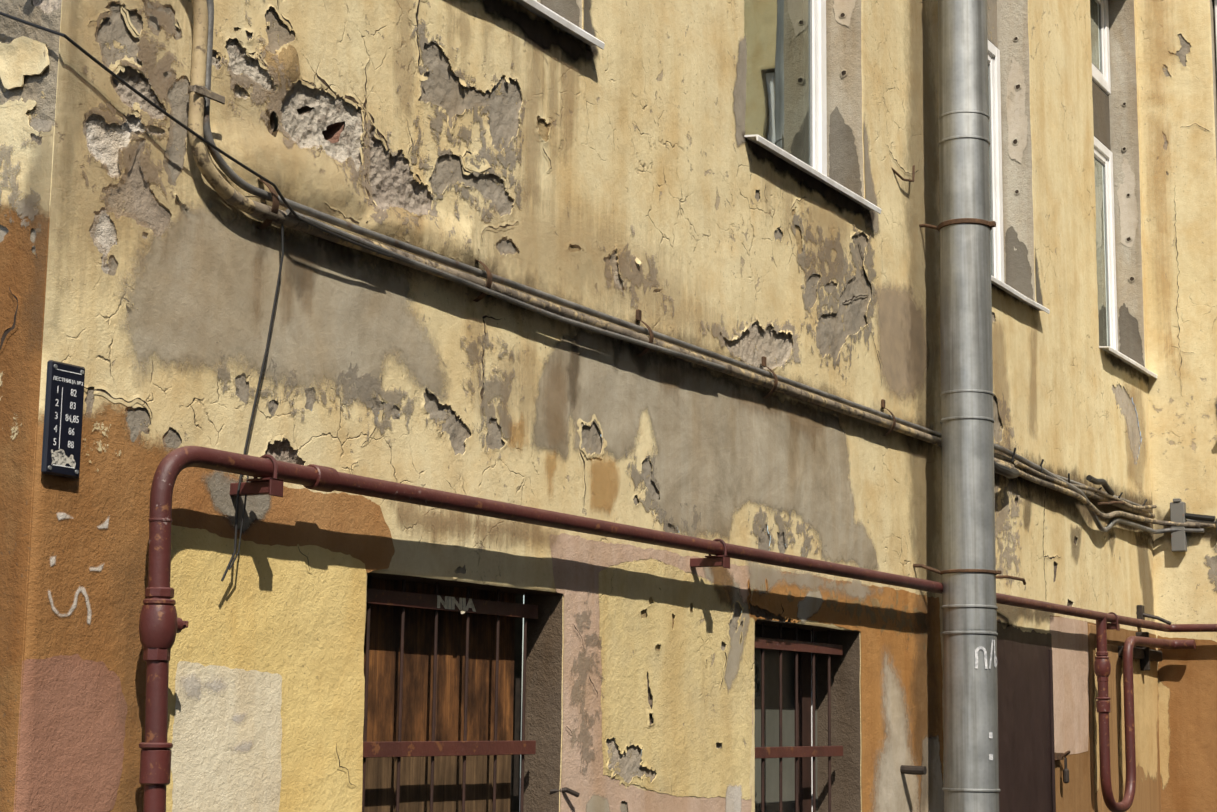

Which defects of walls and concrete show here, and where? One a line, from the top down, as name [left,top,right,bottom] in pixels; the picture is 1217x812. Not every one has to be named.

crack [414,0,427,75]
flaking render [0,0,62,258]
peeling [78,0,198,276]
flaking render [211,0,554,260]
peeling [696,193,877,383]
peeling [577,414,607,459]
damp [398,503,556,544]
peeling [638,583,662,623]
peeling [625,446,709,537]
peeling [748,499,834,557]
peeling [1196,539,1217,592]
peeling [568,591,695,812]